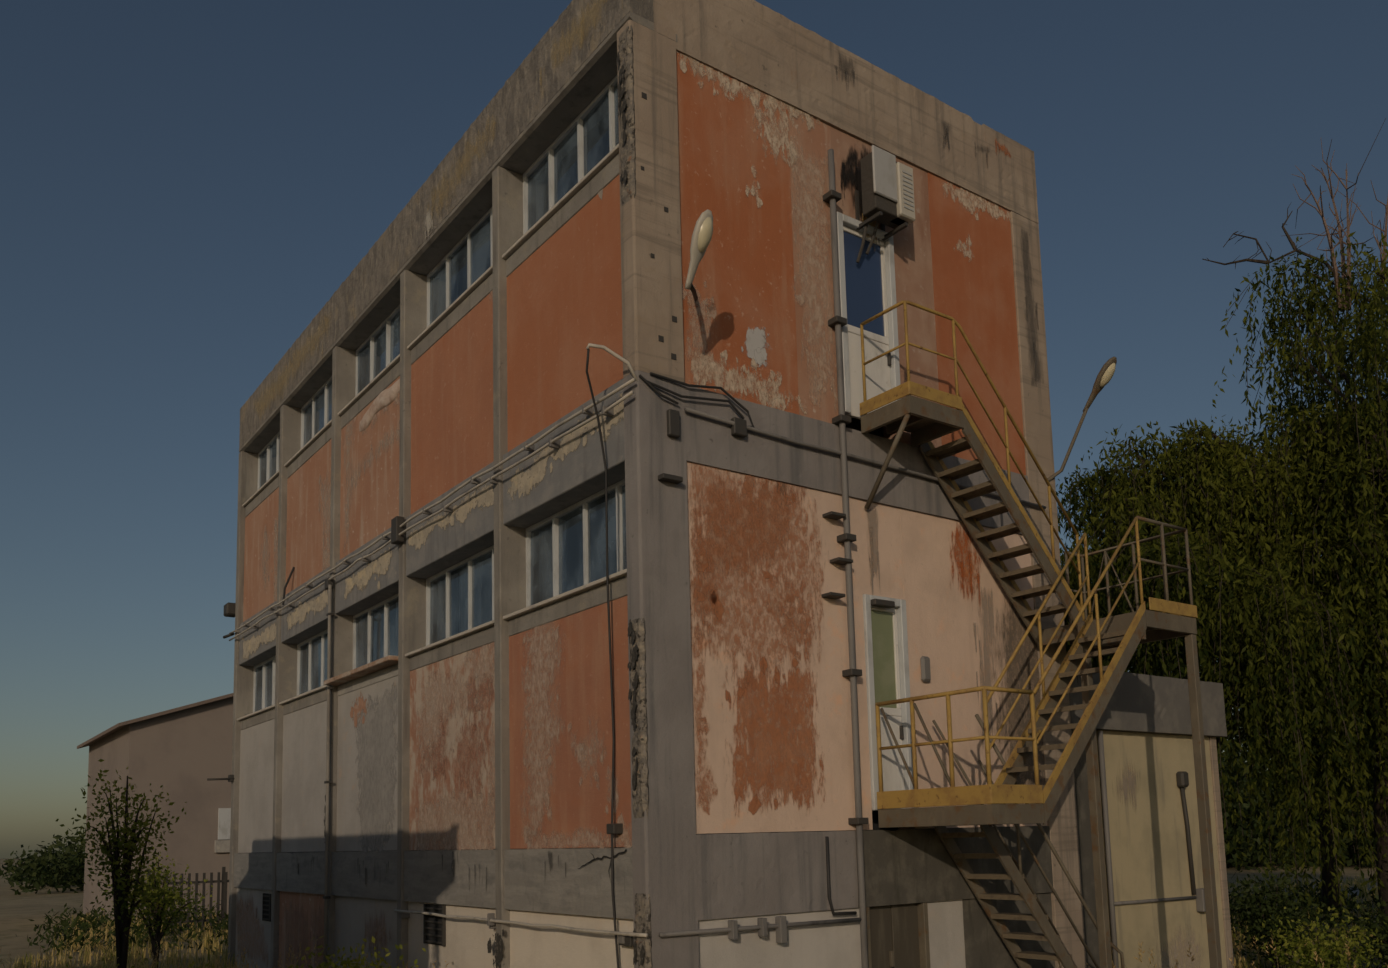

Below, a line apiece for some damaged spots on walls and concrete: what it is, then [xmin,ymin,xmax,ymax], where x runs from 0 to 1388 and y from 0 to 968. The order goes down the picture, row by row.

spalling [616,26,636,206]
peeling [677,52,820,170]
peeling [943,181,1011,222]
peeling [682,288,807,413]
rust [950,527,980,602]
peeling [688,463,824,815]
spalling [527,617,649,849]